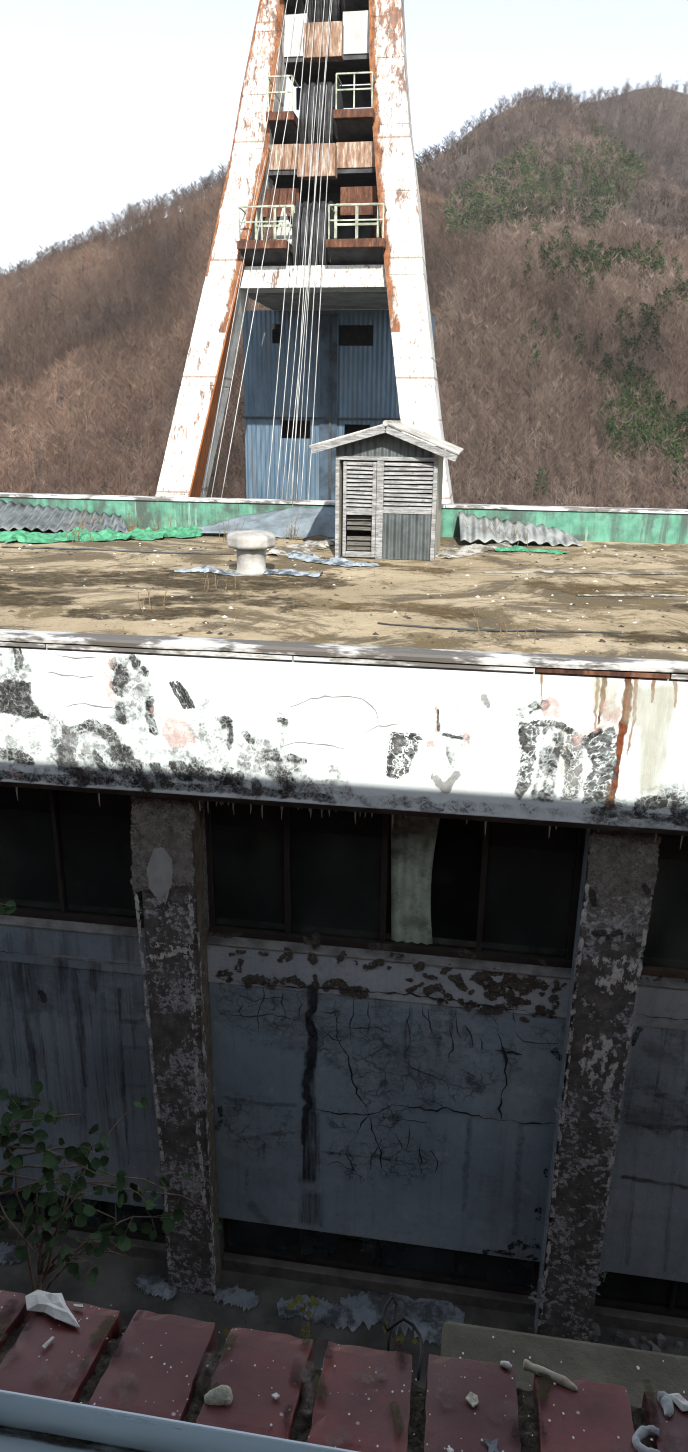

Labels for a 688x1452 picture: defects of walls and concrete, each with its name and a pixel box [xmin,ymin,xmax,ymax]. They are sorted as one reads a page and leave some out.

rust [205,0,284,333]
rust [369,0,400,332]
peeling [427,706,469,793]
rust [594,675,678,809]
water stain [301,985,320,1224]
crack [216,977,564,1178]
peeling [130,796,662,1342]